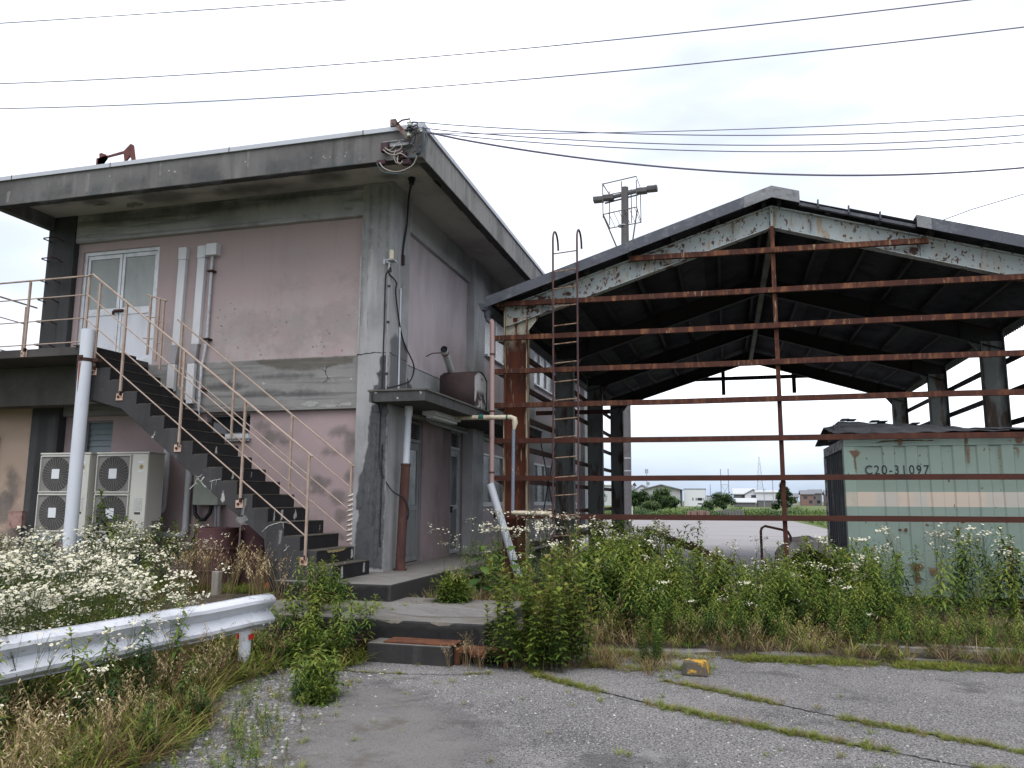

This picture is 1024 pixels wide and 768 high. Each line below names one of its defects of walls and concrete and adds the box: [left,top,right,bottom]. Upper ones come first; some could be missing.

damp [340,355,398,601]